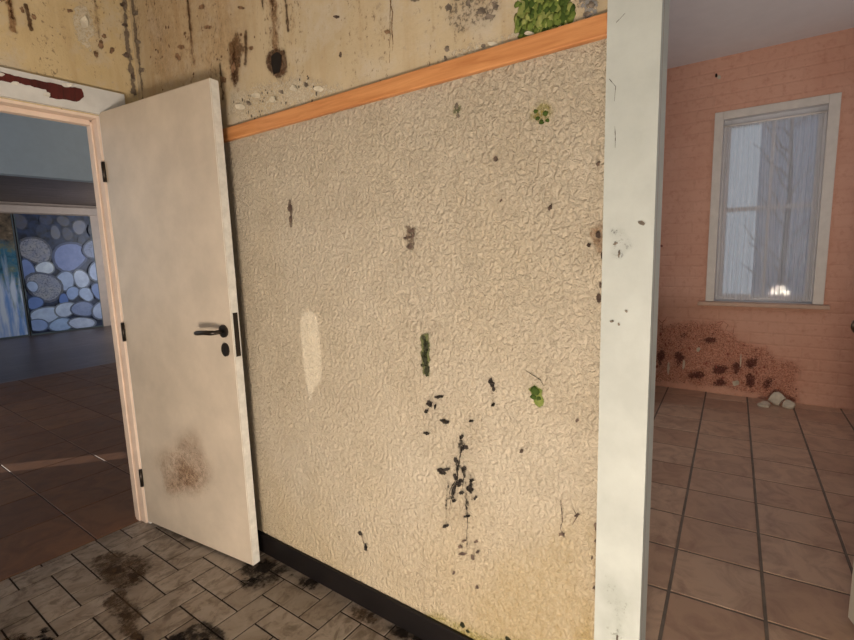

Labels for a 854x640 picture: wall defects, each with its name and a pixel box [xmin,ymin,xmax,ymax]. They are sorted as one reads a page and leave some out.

damp [445,0,499,33]
peeling [0,72,84,102]
damp [216,31,255,100]
damp [437,434,480,560]